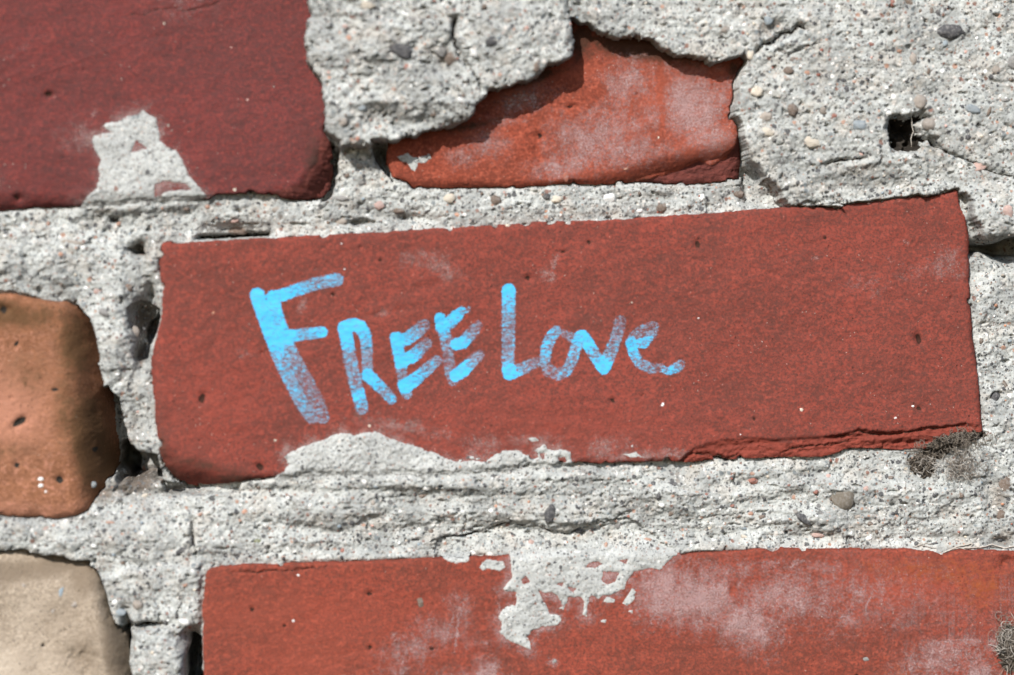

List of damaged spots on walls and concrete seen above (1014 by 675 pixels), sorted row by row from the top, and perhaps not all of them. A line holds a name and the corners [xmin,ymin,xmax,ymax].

crack [451,18,480,86]
spalling [647,131,740,184]
spalling [684,425,982,462]
damp [587,562,621,598]
damp [636,554,890,650]
damp [891,625,997,675]